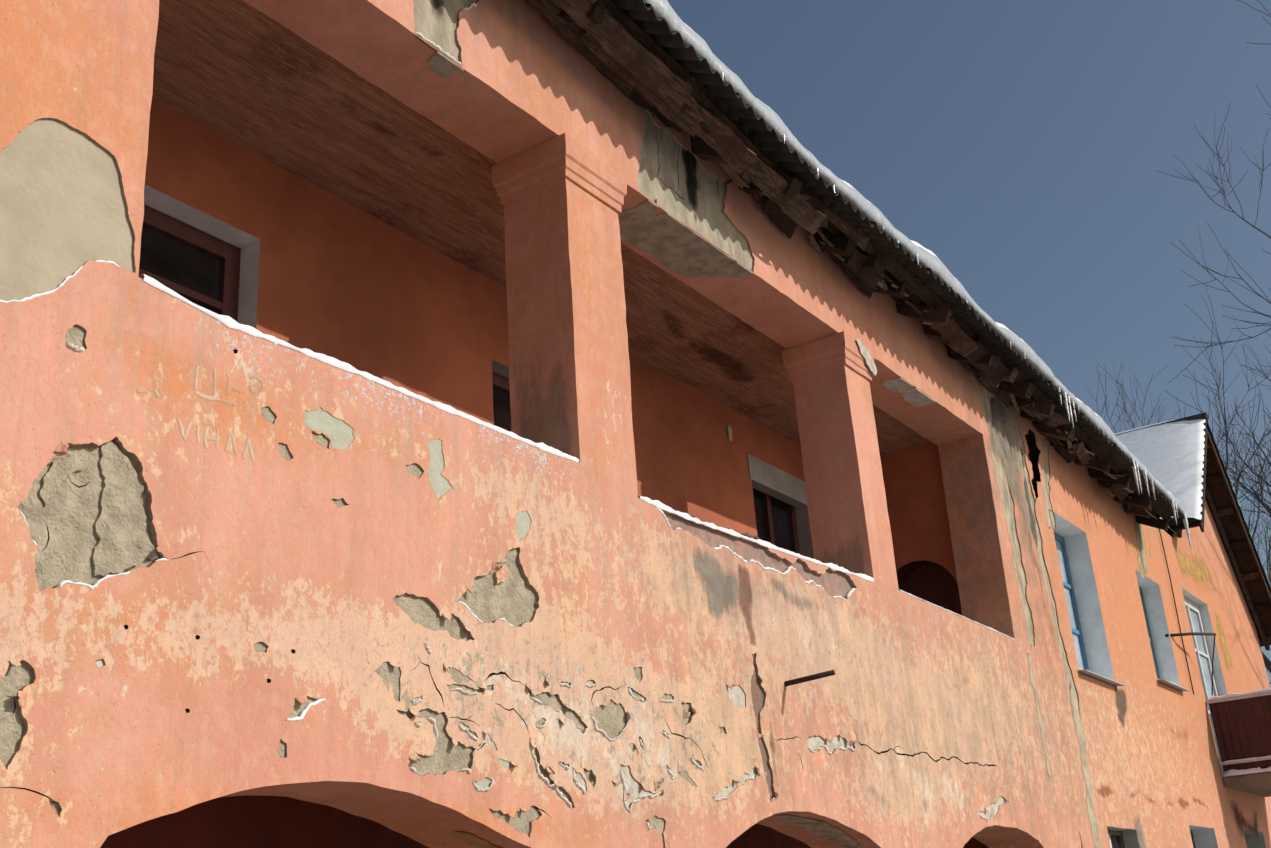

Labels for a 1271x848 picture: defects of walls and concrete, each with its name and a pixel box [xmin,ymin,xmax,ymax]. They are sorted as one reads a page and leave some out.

spalling [413,0,479,78]
spalling [0,118,136,303]
spalling [618,108,756,278]
spalling [18,437,168,590]
spalling [393,510,539,654]
leakage [988,398,1043,592]
spalling [0,658,36,769]
peeling [375,659,518,792]
peeling [526,667,704,813]
peeling [712,653,778,801]
crack [854,729,996,766]
leakage [1070,680,1101,848]